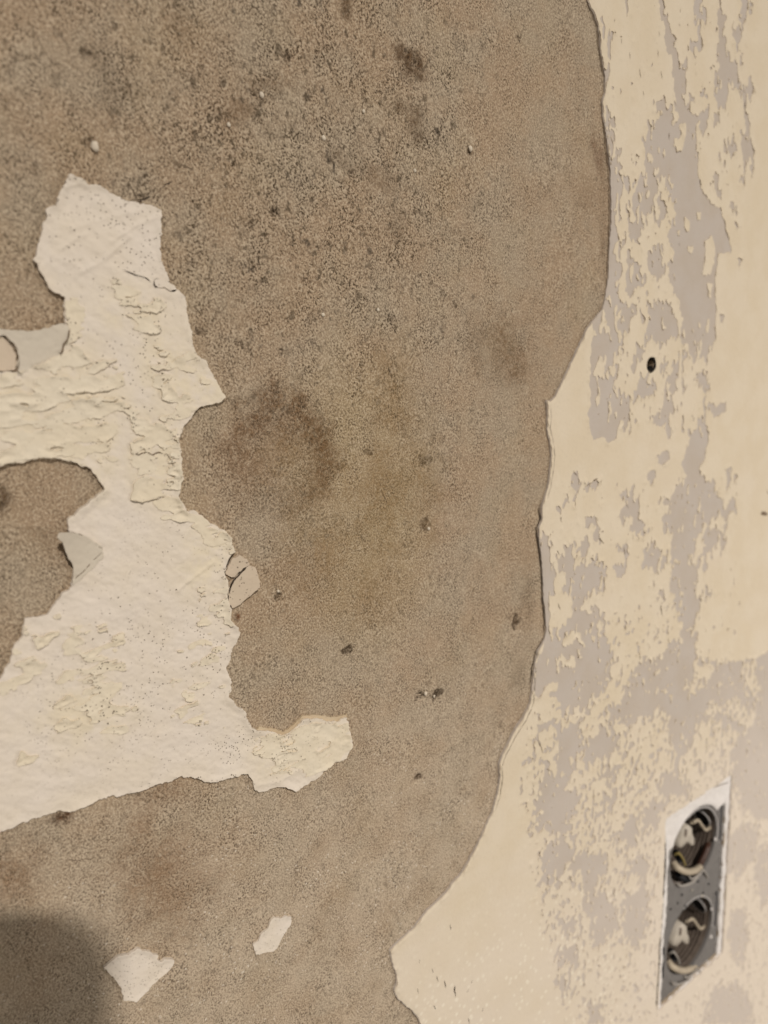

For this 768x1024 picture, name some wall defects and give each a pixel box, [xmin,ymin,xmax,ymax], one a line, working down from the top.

peeling [0,174,353,832]
peeling [389,0,768,1024]
peeling [103,947,174,1002]
peeling [252,915,292,955]